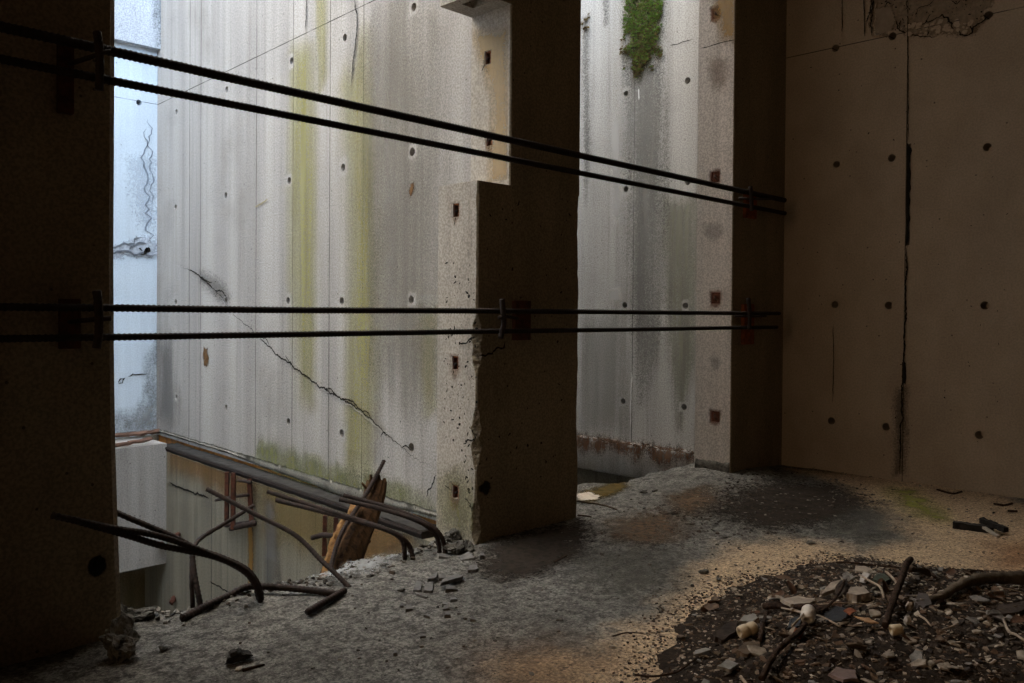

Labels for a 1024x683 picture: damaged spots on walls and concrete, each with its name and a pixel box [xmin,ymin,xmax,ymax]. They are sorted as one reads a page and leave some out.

crack [350,0,358,81]
peeling [866,0,995,38]
crack [141,120,155,241]
crack [899,9,912,474]
crack [177,262,435,497]
spalling [443,315,511,573]
corrosion [577,432,694,469]
corrosion [170,454,339,583]